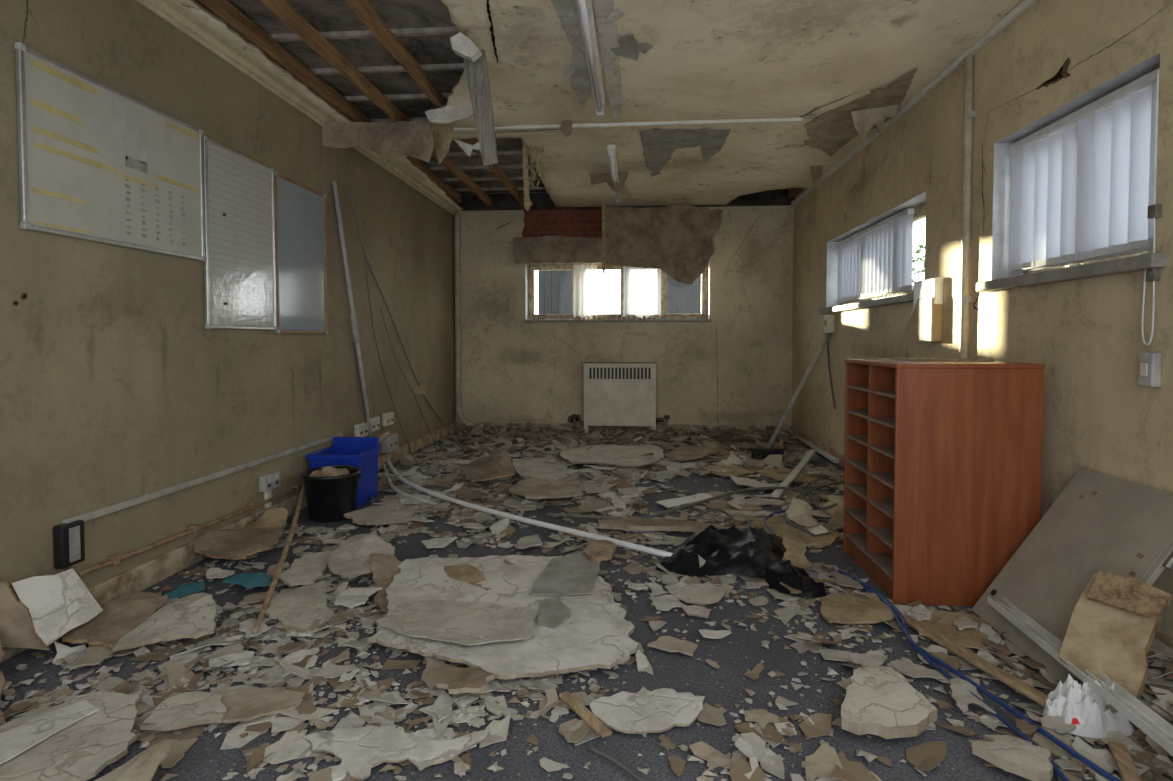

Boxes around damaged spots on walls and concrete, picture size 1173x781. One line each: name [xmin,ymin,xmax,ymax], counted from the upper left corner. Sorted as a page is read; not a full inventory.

crack [486,0,498,63]
flaking render [522,208,602,238]